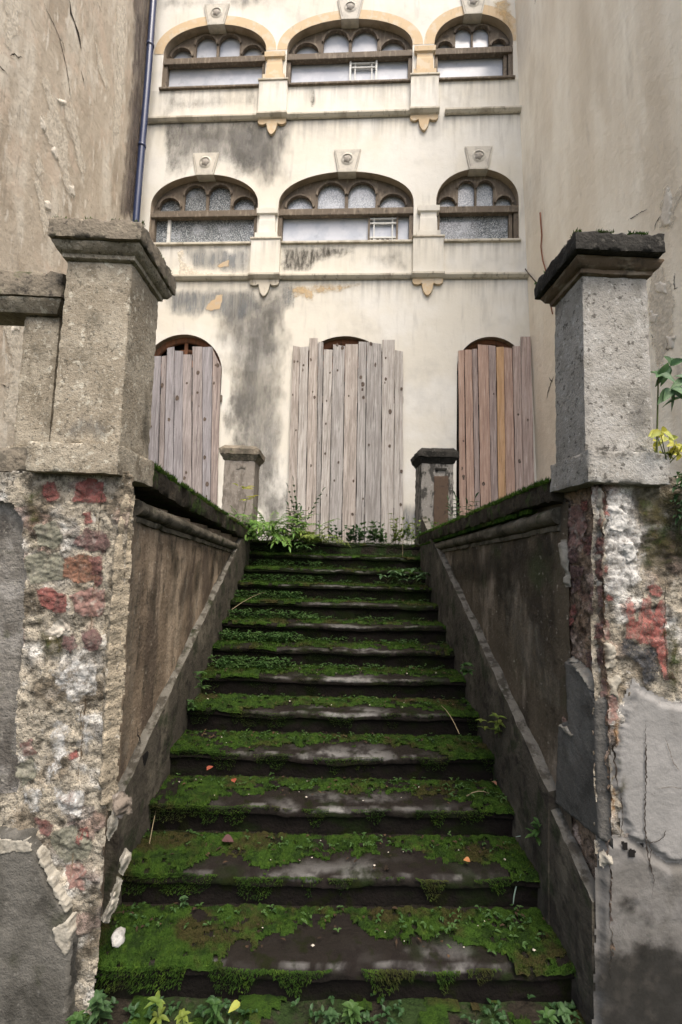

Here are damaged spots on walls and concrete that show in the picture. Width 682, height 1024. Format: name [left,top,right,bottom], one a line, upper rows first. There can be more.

water stain [167,123,285,180]
peeling [206,295,223,311]
water stain [285,249,342,270]
water stain [172,287,294,522]
spalling [0,471,134,1015]
spalling [558,476,682,957]
crack [612,720,681,893]